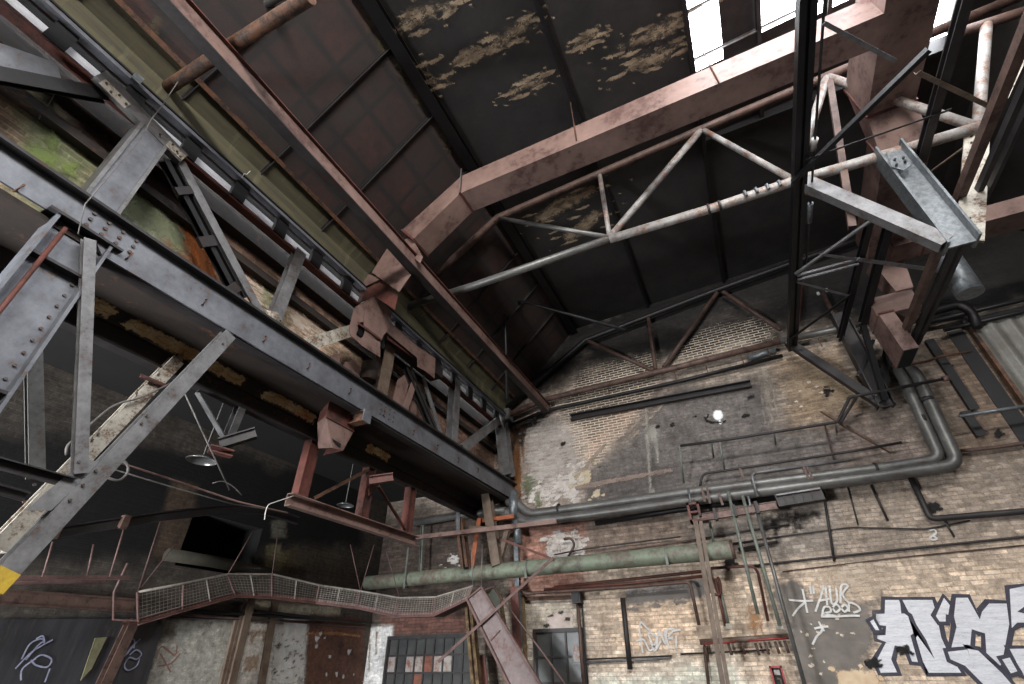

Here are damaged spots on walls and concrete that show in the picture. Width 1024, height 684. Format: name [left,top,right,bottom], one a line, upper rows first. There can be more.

rust [178,226,216,279]
peeling [94,297,200,361]
peeling [208,361,245,386]
peeling [261,391,317,425]
peeling [519,352,675,509]
peeling [539,527,589,558]